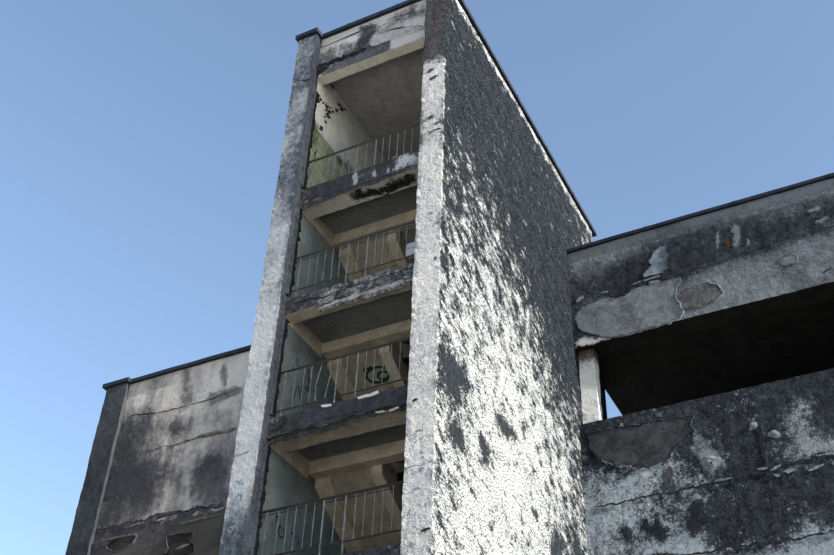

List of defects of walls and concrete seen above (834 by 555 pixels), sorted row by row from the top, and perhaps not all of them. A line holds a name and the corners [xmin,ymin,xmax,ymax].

spalling [348,173,418,201]
damp [434,249,449,273]
crack [581,225,834,309]
spalling [315,276,413,312]
spalling [573,245,724,339]
crack [105,389,237,417]
damp [432,331,471,455]
damp [494,409,519,442]
damp [476,426,491,470]
spalling [248,398,417,555]
crack [591,450,834,512]
crack [652,530,834,555]